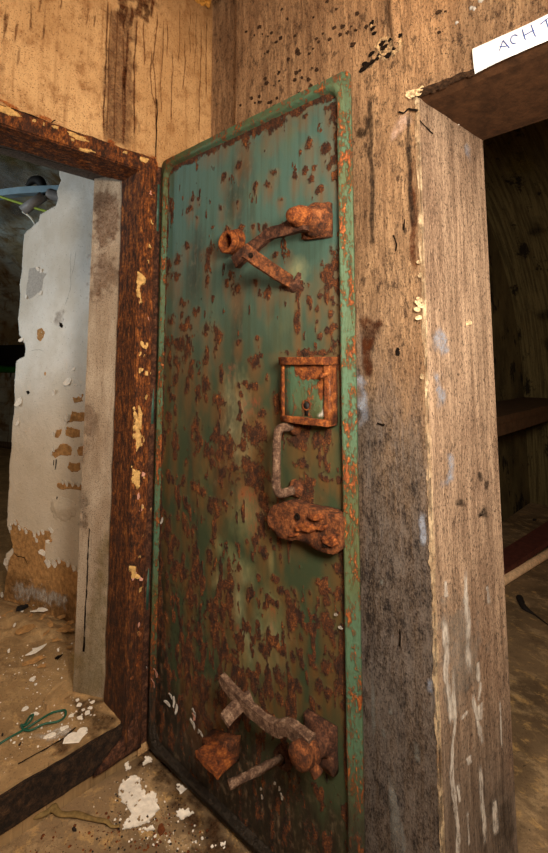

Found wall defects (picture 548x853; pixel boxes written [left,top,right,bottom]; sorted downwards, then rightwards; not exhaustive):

damp [103,0,207,143]
spalling [287,20,404,73]
rust [293,365,324,401]
peeling [50,393,85,490]
peeling [0,520,78,624]
rust [74,699,115,730]
rust [151,764,235,853]